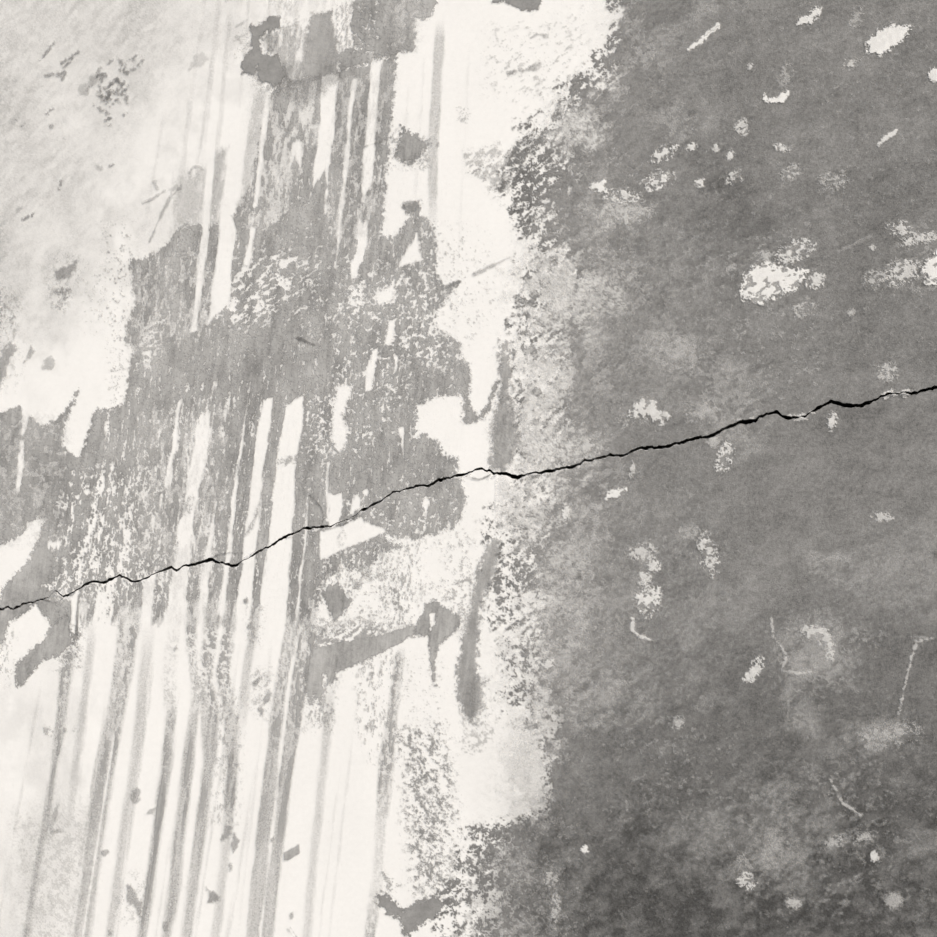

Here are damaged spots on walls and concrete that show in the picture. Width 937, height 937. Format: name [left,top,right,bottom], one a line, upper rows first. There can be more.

crack [0,385,937,610]
water stain [46,655,73,815]
water stain [90,623,137,828]
water stain [141,714,173,935]
water stain [166,620,230,927]
water stain [226,745,237,813]
water stain [256,625,316,886]
water stain [378,660,401,794]
water stain [534,805,937,937]